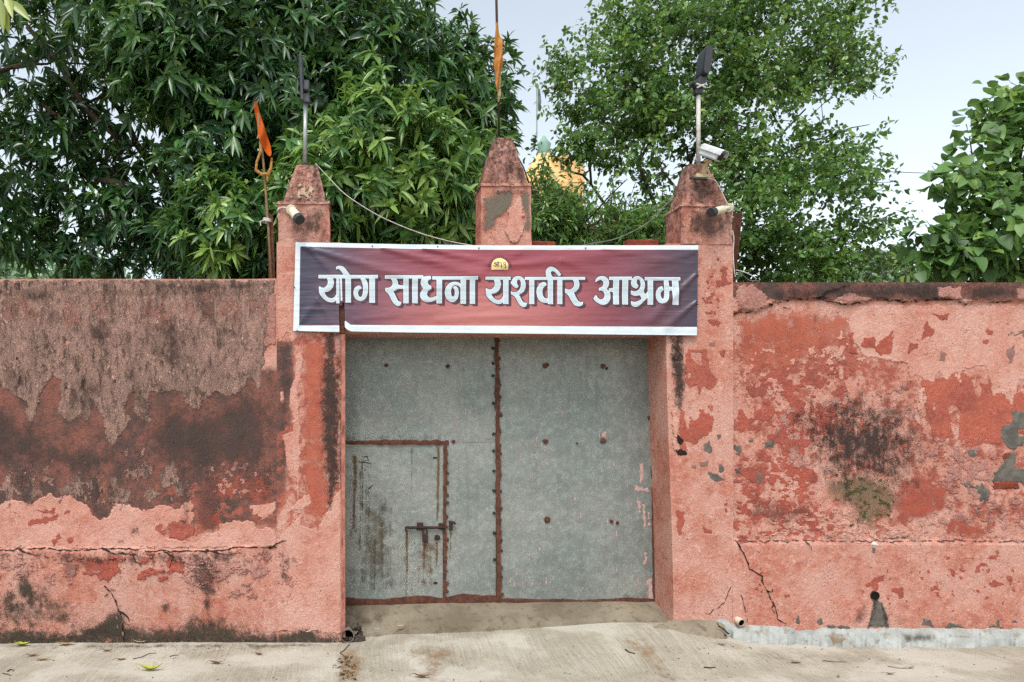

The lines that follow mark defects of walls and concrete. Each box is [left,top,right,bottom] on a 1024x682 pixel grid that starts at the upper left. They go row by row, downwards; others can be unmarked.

peeling [505,195,525,243]
peeling [670,257,1024,545]
peeling [0,272,365,642]
crack [104,585,129,641]
crack [0,540,287,567]
crack [709,532,1024,636]
peeling [946,550,1020,629]